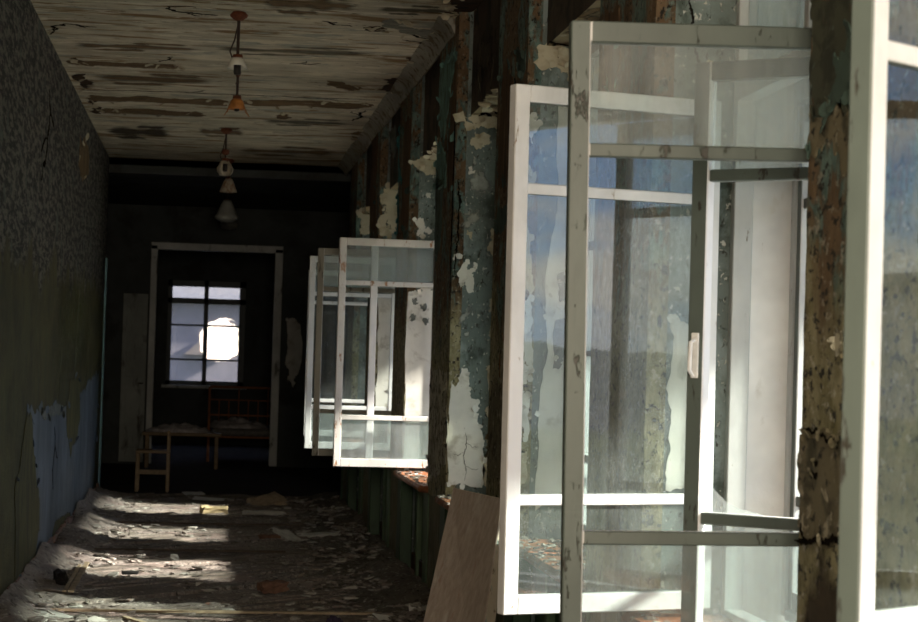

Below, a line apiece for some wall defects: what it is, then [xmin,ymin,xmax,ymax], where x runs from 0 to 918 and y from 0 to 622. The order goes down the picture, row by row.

peeling [63,58,228,117]
peeling [243,80,374,120]
peeling [356,43,569,262]
peeling [453,253,478,293]
peeling [26,371,99,555]
peeling [375,293,391,407]
peeling [395,288,503,505]
peeling [520,197,567,494]
crack [798,427,841,443]
crack [794,523,839,547]